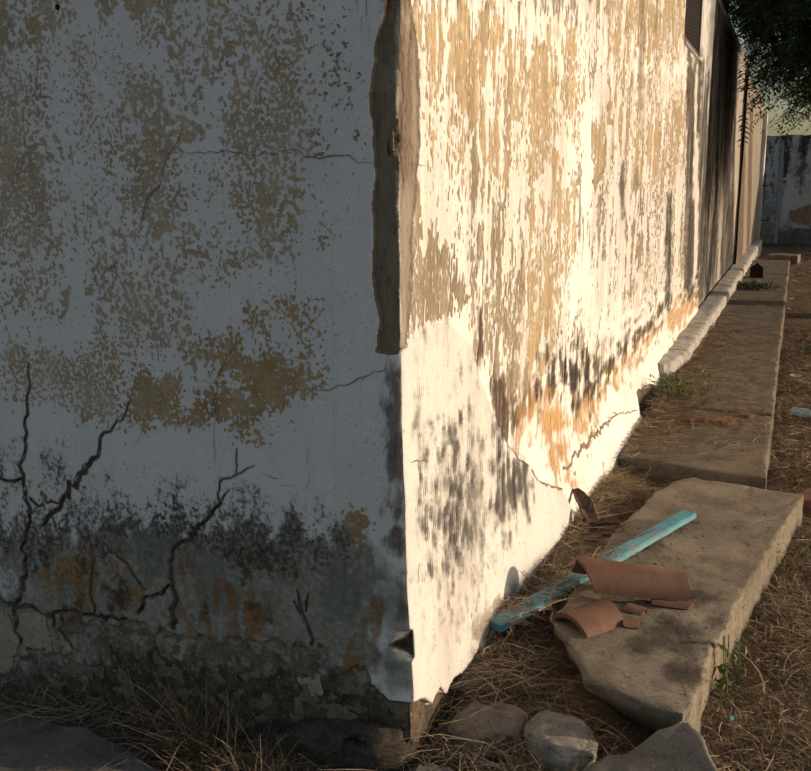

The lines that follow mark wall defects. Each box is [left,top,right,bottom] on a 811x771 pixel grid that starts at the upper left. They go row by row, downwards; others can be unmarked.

peeling [0,0,690,448]
water stain [763,135,811,199]
crack [0,363,309,648]
water stain [0,437,413,691]
crack [312,354,390,391]
water stain [380,367,406,557]
water stain [412,2,753,641]
crack [529,410,638,490]
spalling [0,610,463,744]